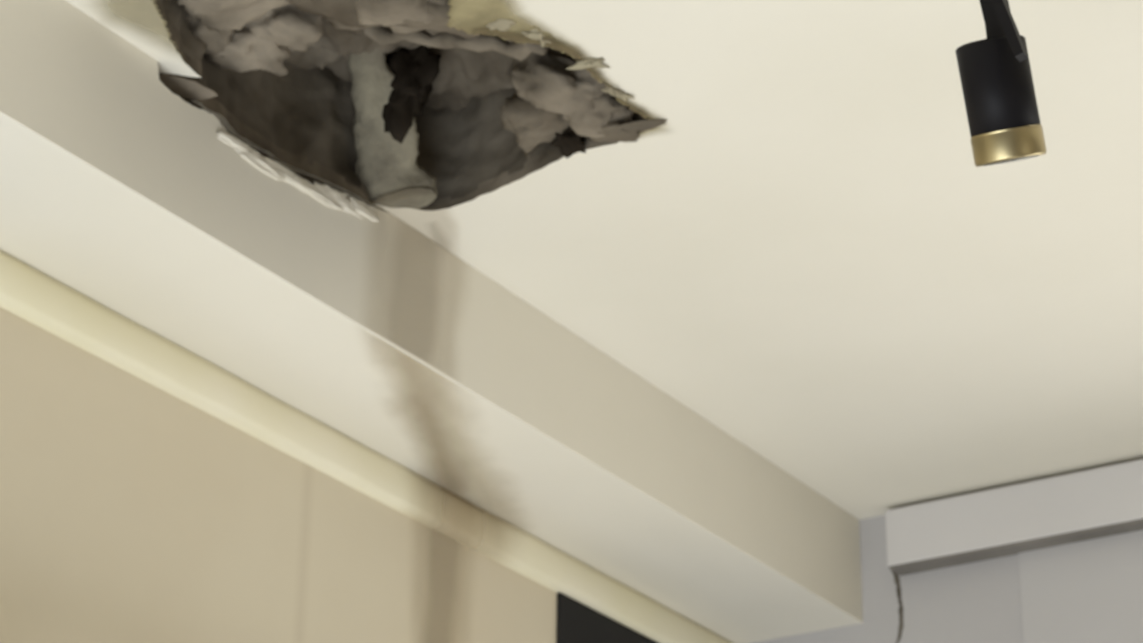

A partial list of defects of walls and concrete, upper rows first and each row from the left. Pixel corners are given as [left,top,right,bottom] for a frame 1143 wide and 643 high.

peeling [159,73,218,101]
flaking render [446,0,667,135]
water stain [435,489,481,549]
crack [892,571,904,643]